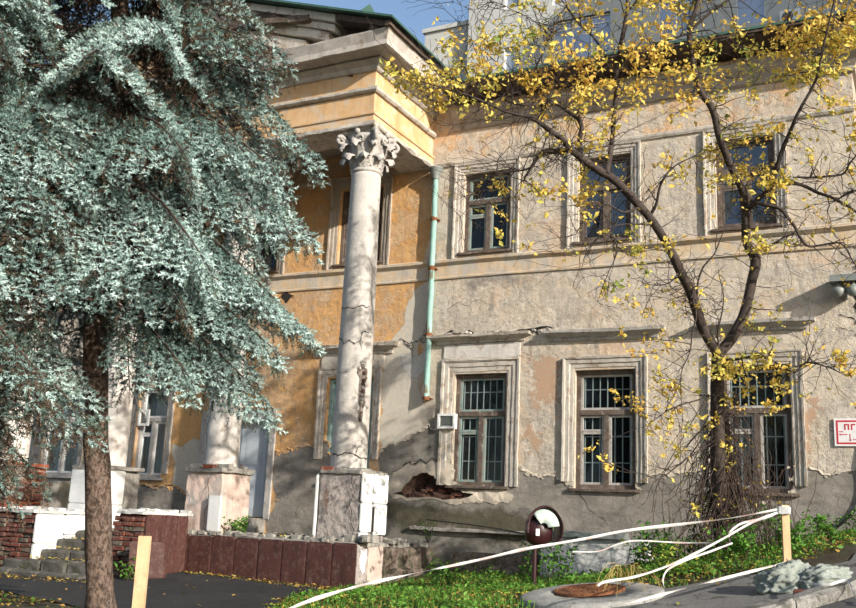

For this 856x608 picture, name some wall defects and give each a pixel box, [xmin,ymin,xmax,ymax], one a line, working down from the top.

peeling [137,338,208,513]
crack [331,446,368,535]
flaking render [378,280,714,569]
flaking render [730,397,856,544]